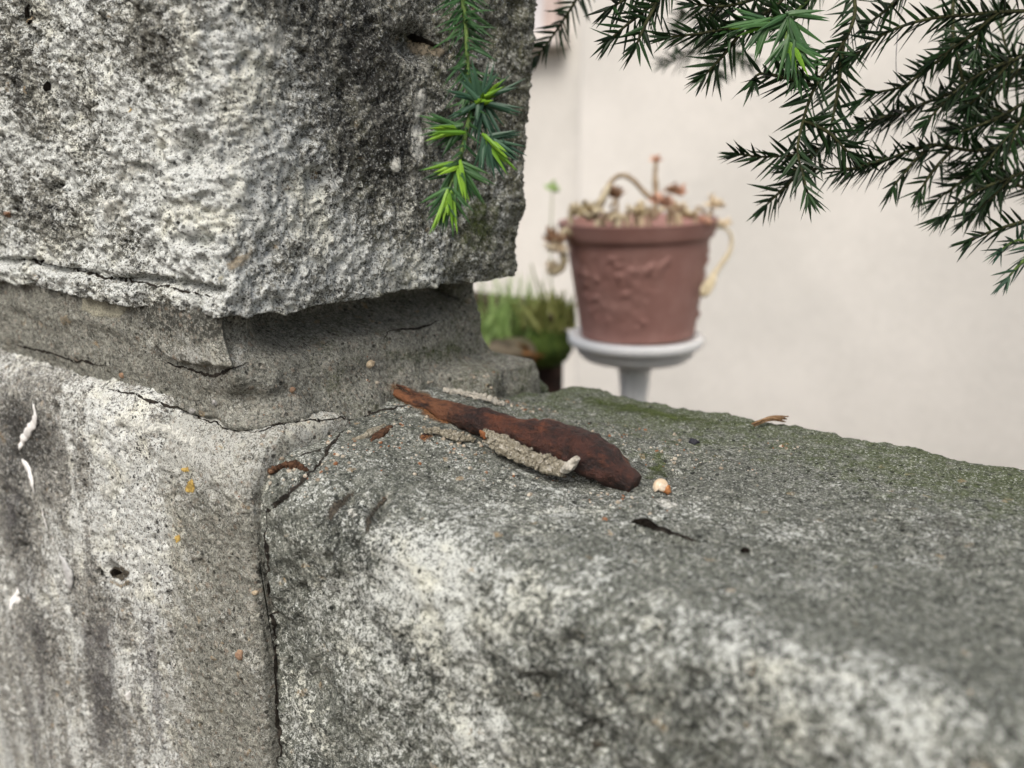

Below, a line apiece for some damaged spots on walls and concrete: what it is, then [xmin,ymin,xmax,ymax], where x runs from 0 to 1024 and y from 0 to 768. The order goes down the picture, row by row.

crack [2,256,212,297]
crack [15,344,407,767]